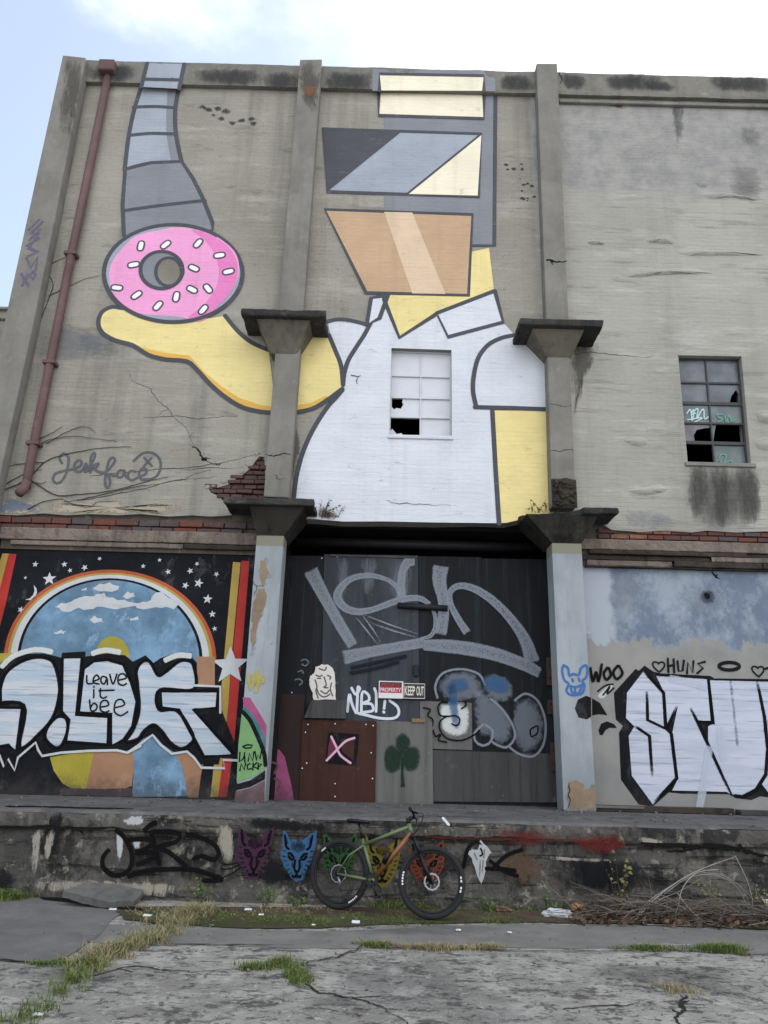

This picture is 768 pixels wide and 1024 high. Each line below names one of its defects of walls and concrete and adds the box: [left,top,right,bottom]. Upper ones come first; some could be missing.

water stain [201,69,255,85]
water stain [270,73,296,87]
water stain [610,74,671,90]
water stain [574,347,591,400]
crack [64,375,287,502]
spalling [204,452,266,500]
spalling [551,478,578,508]
water stain [693,476,757,520]
peeling [250,557,271,656]
peeling [567,780,597,811]